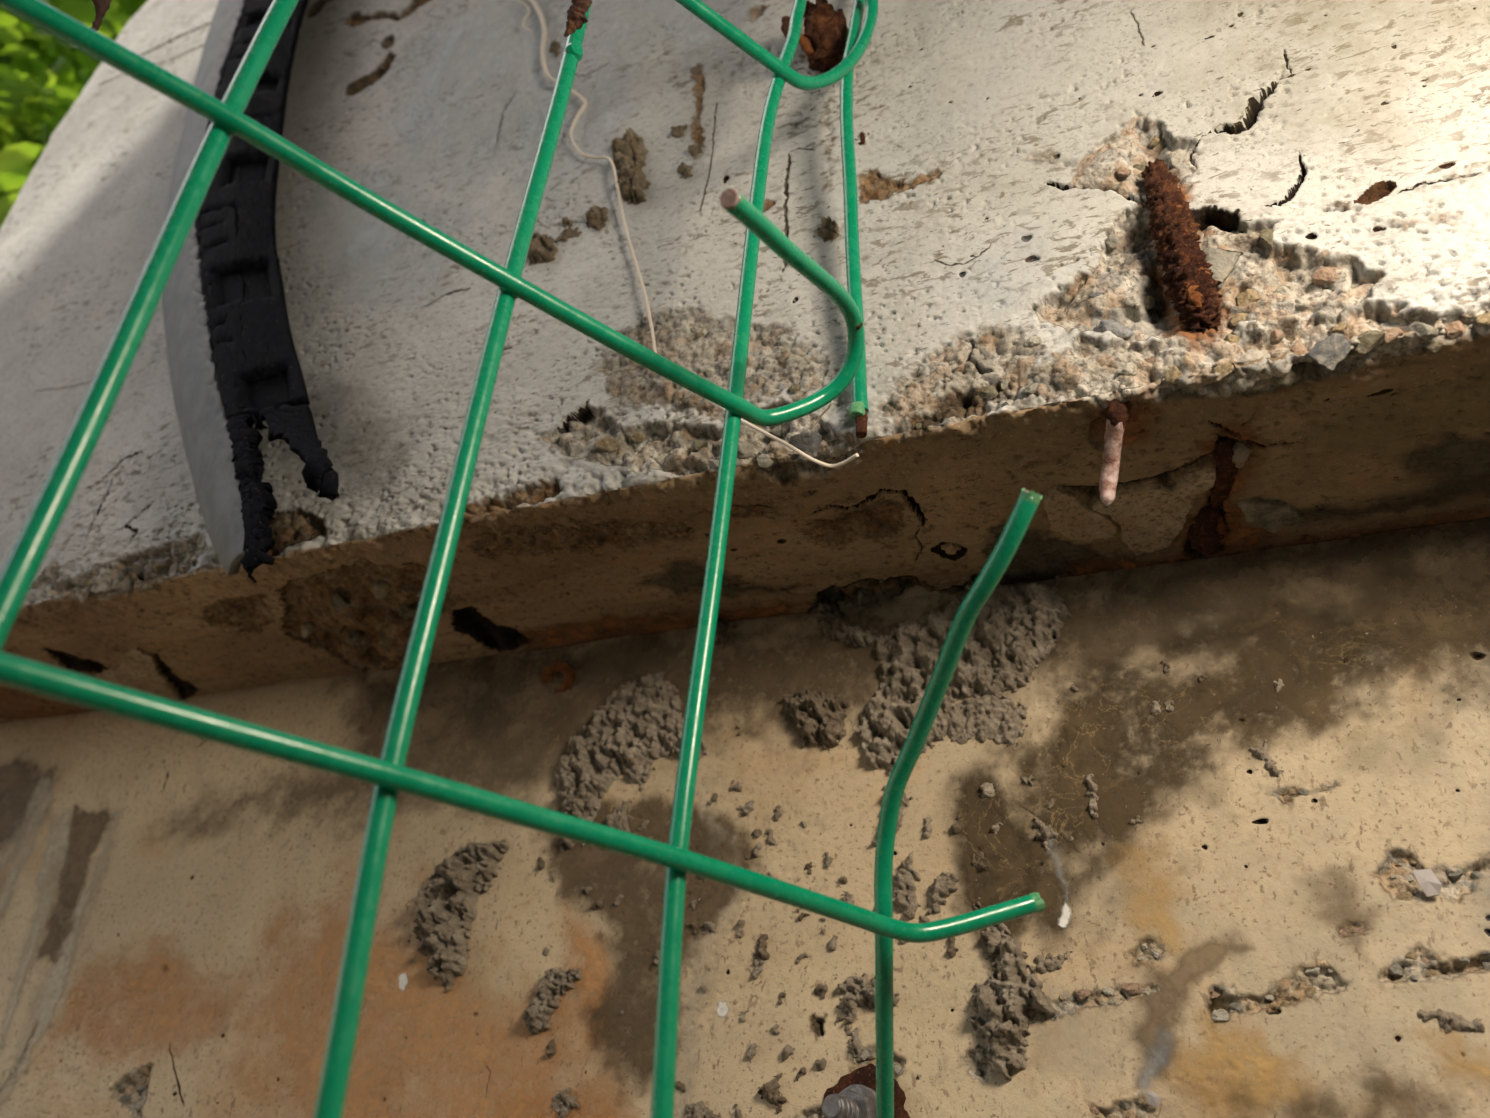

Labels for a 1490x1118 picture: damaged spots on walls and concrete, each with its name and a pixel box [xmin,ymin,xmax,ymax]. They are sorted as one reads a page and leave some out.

crack [1190,49,1299,166]
crack [1191,151,1307,233]
rust [1141,159,1228,349]
spalling [880,115,1490,439]
spalling [542,306,865,485]
rust [1094,400,1152,445]
leakage [1002,530,1106,580]
rust [1187,435,1253,556]
leakage [955,544,1490,949]
spalling [1374,850,1490,902]
leakage [0,777,120,1102]
spalling [1209,959,1347,1022]